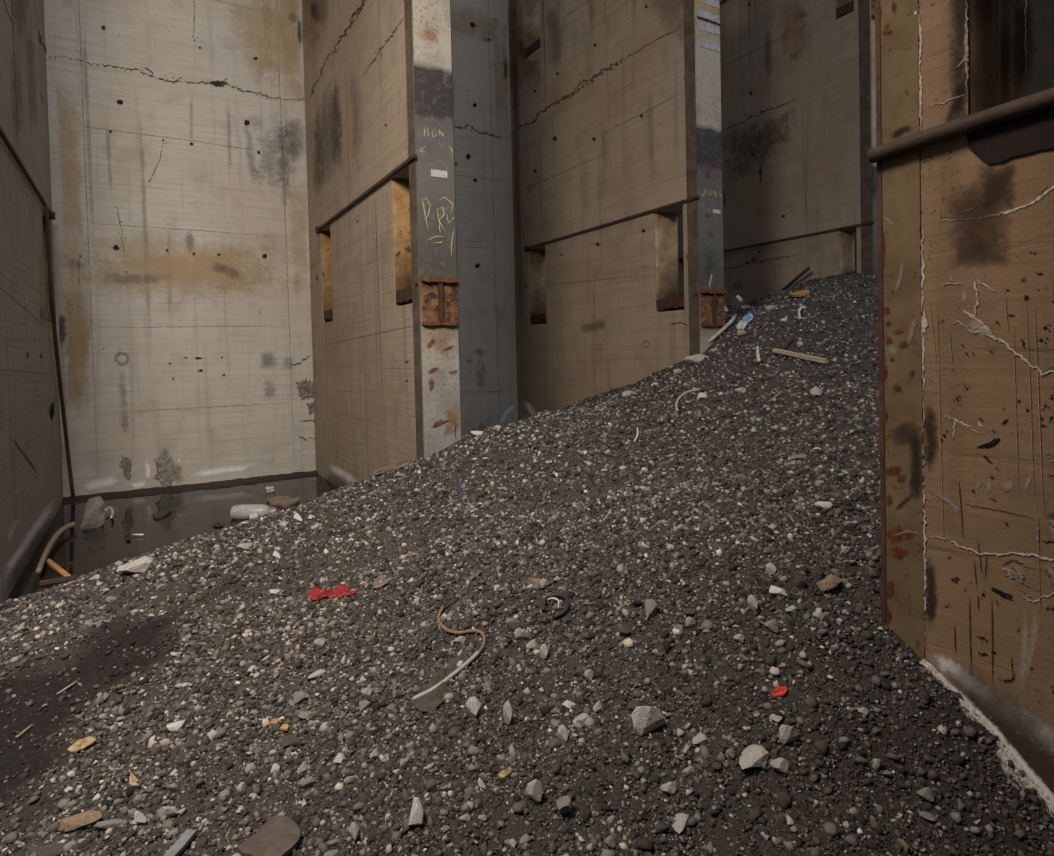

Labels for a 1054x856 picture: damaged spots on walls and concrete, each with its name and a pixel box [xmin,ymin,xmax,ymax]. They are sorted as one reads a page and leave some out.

crack [4,0,364,101]
crack [362,19,403,77]
crack [455,27,680,139]